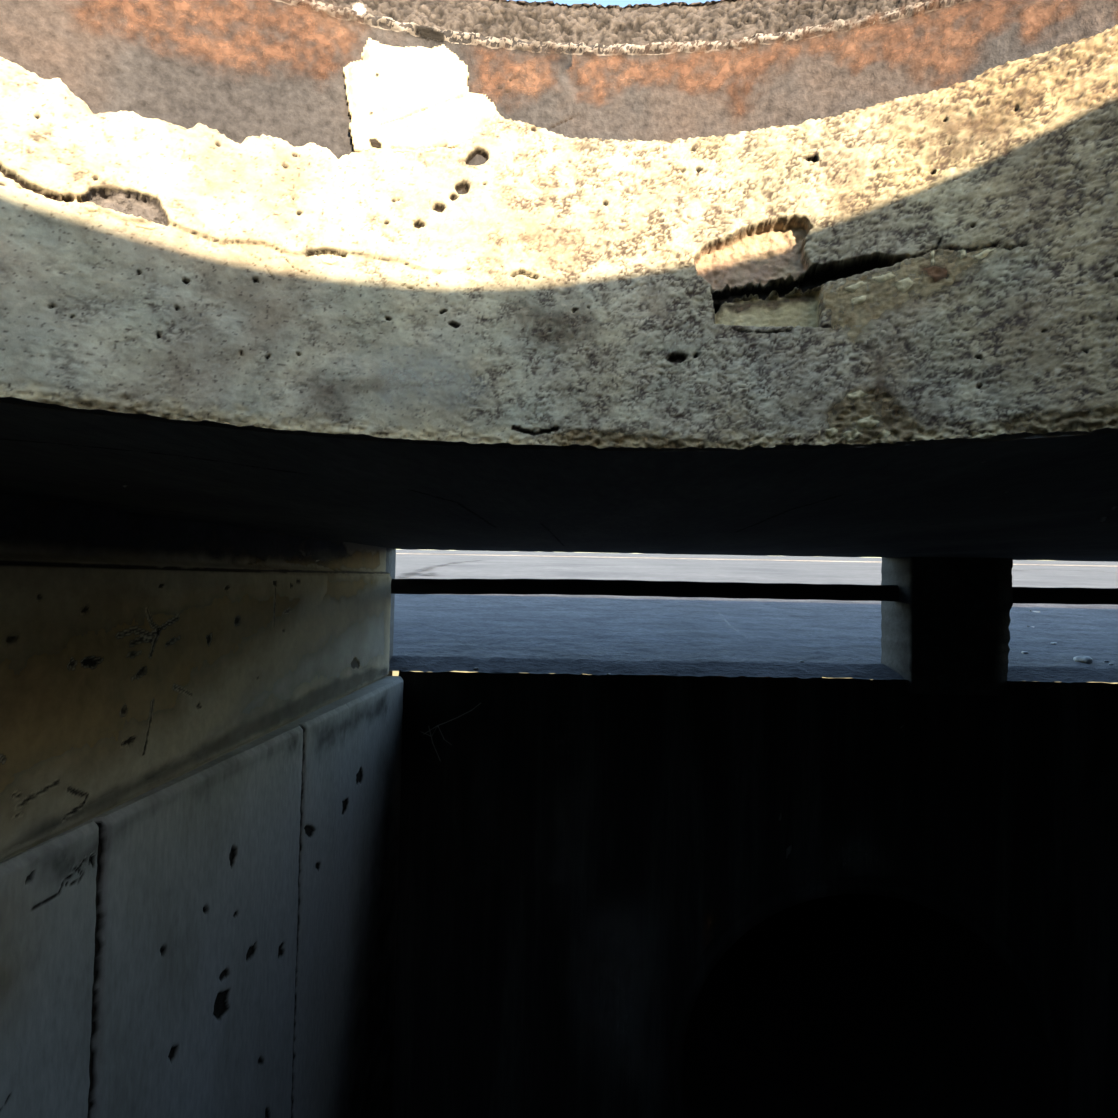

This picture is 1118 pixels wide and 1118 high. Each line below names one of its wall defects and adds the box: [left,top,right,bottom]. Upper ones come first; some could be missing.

rust [479,50,552,96]
crack [0,164,74,202]
spalling [81,188,168,229]
crack [173,224,343,280]
spalling [694,219,1027,334]